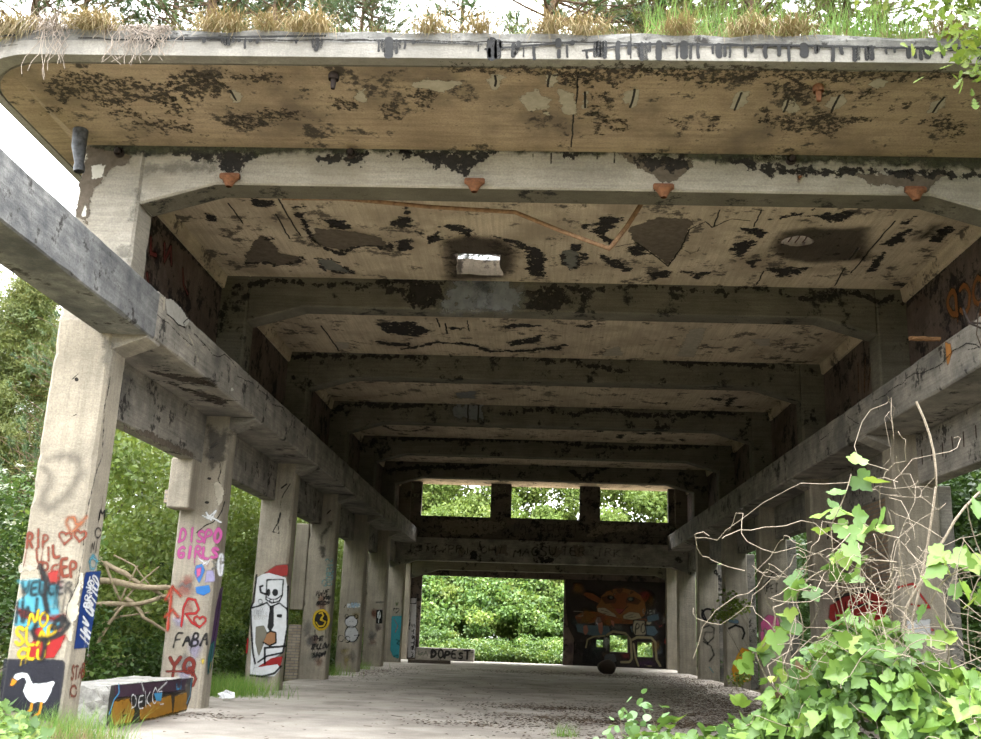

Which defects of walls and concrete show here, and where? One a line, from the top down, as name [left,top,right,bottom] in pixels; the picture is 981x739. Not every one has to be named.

damp [377,37,415,59]
damp [477,37,536,61]
damp [86,145,481,172]
damp [638,153,981,171]
peeling [524,244,589,278]
peeling [562,216,967,307]